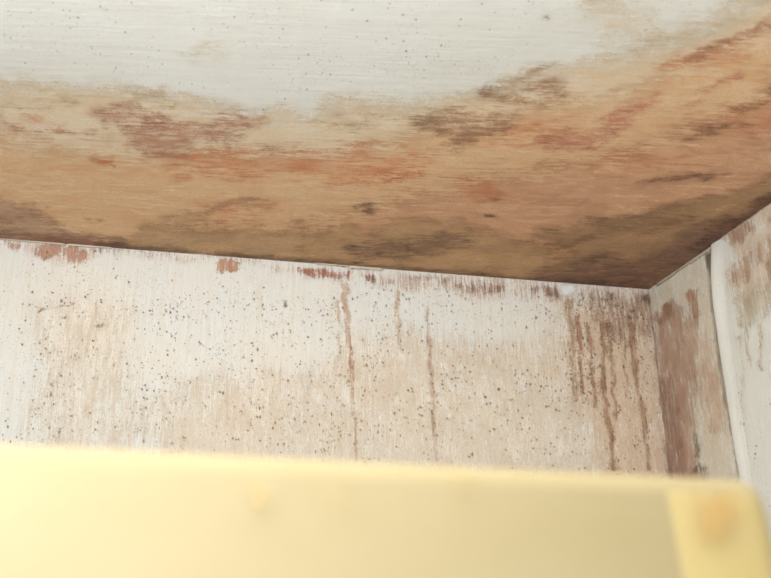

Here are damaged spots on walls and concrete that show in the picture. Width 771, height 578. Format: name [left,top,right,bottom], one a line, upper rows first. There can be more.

rust [31,243,101,263]
rust [297,267,350,279]
water stain [2,294,136,451]